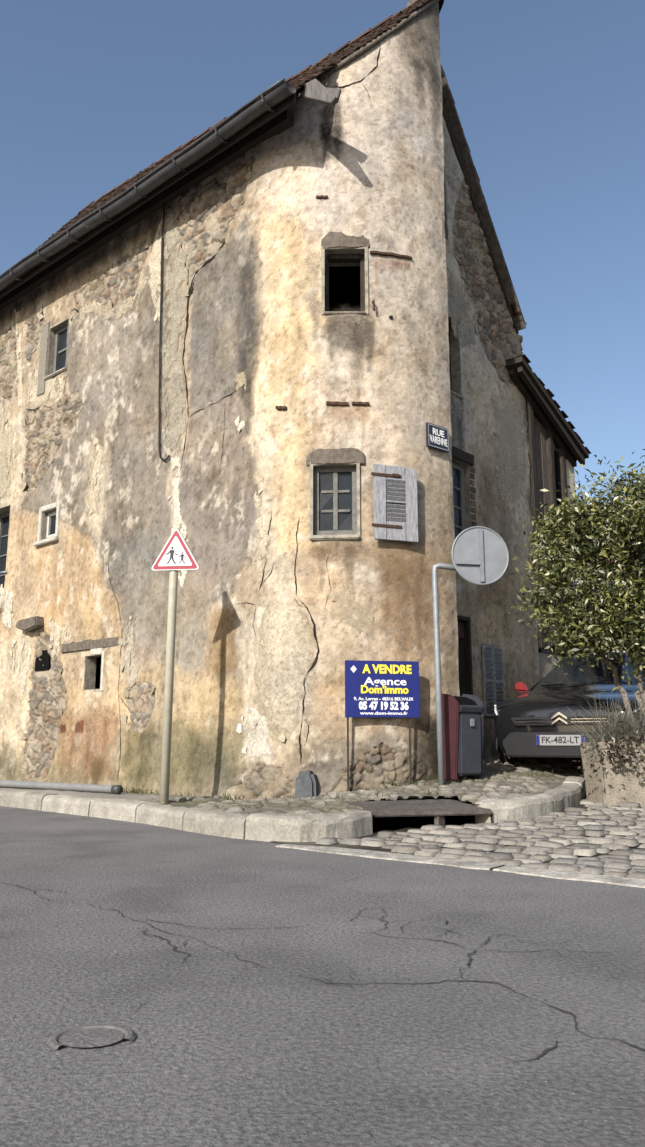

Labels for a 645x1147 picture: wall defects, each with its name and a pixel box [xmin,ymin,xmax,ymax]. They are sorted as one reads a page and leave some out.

damp [321,105,340,143]
crack [336,43,380,101]
flaking render [0,305,84,498]
crack [174,216,235,469]
flaking render [449,179,523,386]
flaking render [0,584,72,780]
flaking render [117,616,156,734]
crack [229,510,332,761]